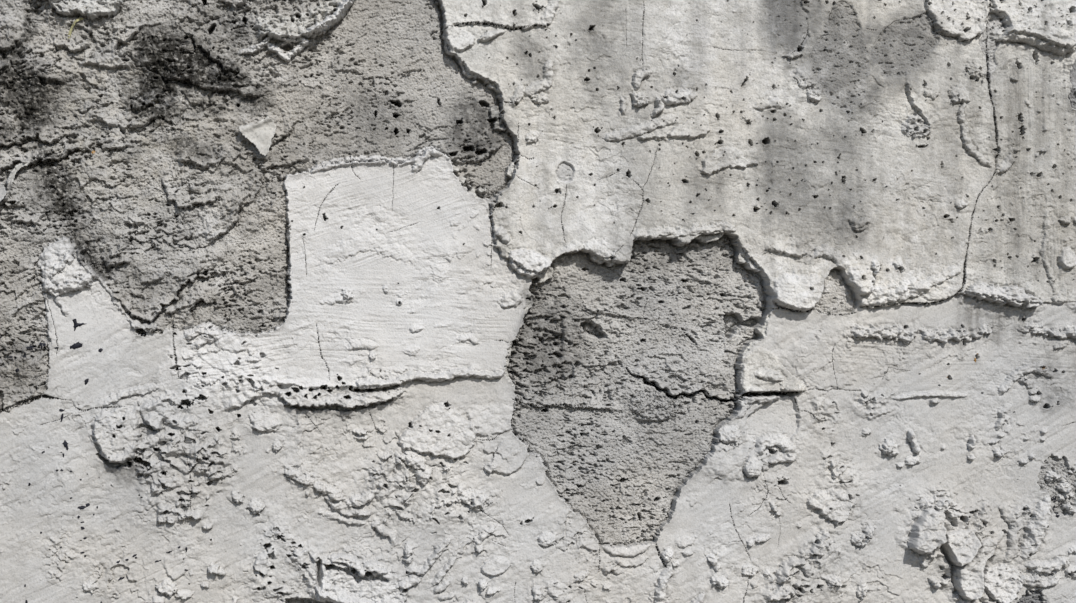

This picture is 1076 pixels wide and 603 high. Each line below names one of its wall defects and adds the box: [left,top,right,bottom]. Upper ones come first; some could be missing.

spalling [0,0,520,413]
crack [628,348,859,420]
spalling [439,0,1076,547]
crack [773,0,998,316]